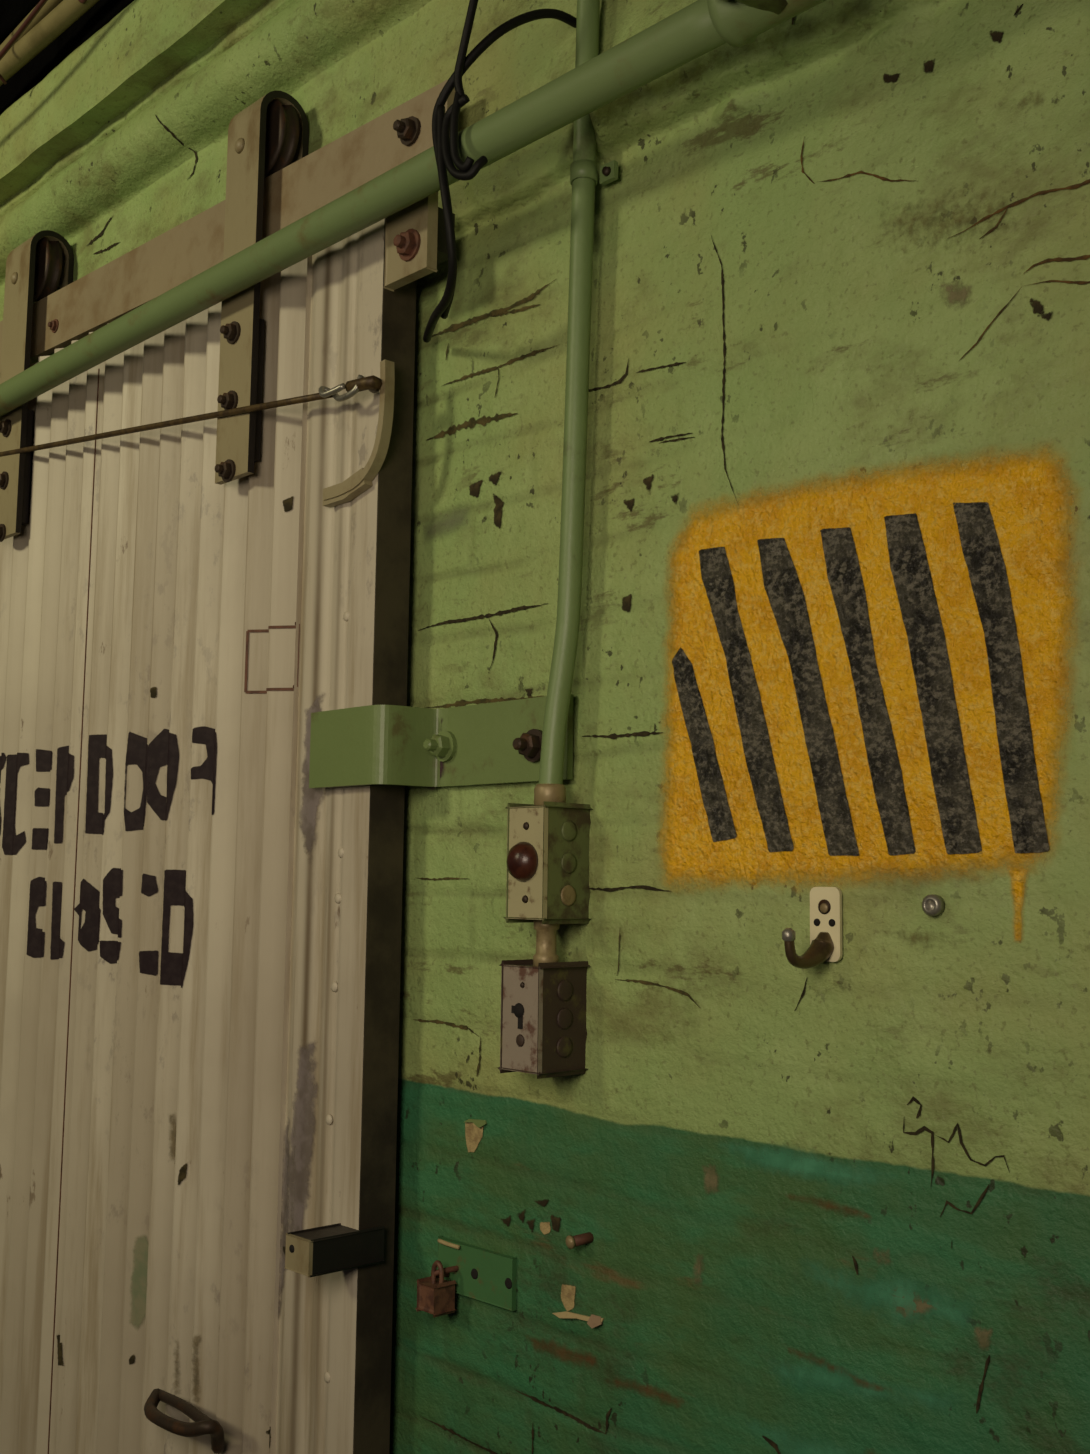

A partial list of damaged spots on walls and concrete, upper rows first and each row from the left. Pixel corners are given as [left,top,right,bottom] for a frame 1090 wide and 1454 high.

crack [949,179,1090,240]
crack [427,279,560,440]
crack [589,359,686,391]
crack [650,236,738,503]
crack [959,255,1090,361]
crack [418,603,549,708]
peeling [465,1119,487,1152]
peeling [501,1199,560,1235]
crack [903,1097,1010,1248]
peeling [552,1284,604,1328]